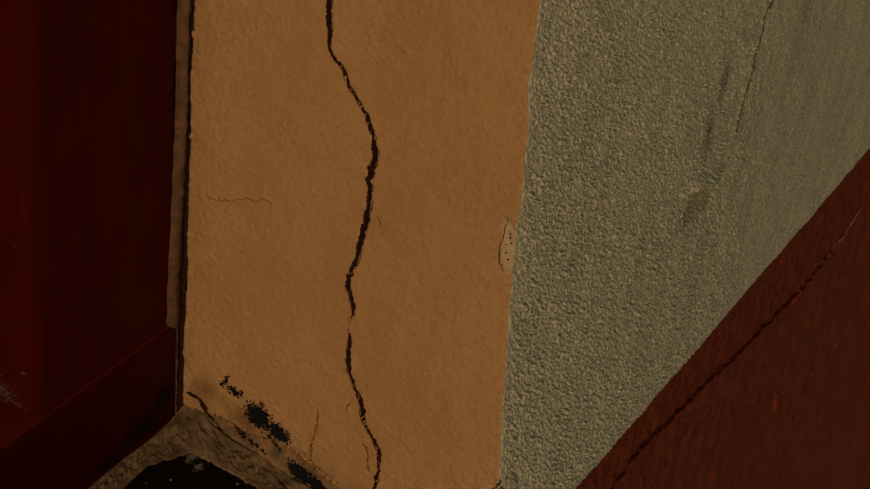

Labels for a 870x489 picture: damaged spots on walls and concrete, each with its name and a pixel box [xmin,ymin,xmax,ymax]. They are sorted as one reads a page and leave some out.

crack [325,0,382,489]
spalling [498,214,517,279]